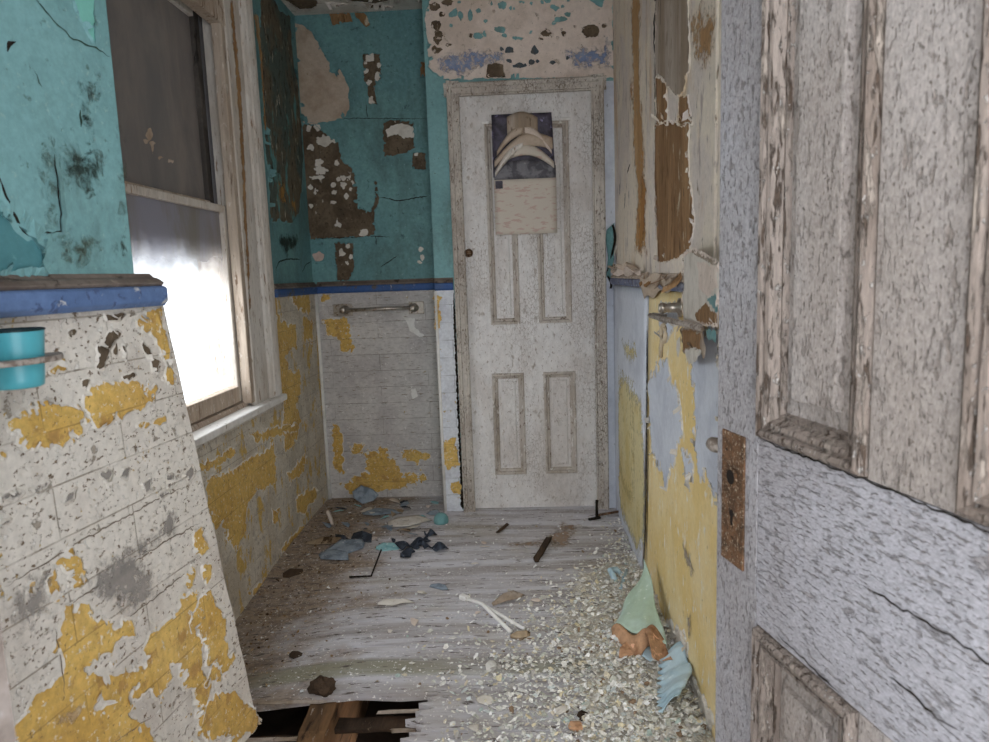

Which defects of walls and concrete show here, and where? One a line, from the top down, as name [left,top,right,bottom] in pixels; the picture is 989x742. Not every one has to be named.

crack [0,28,16,51]
crack [38,2,109,57]
peeling [418,0,613,82]
crack [0,154,67,244]
leakage [68,151,102,196]
peeling [258,0,401,281]
peeling [382,119,427,171]
peeling [606,0,719,506]
peeling [0,294,460,742]
crack [779,636,836,690]
crack [862,585,989,665]
crack [890,677,961,732]